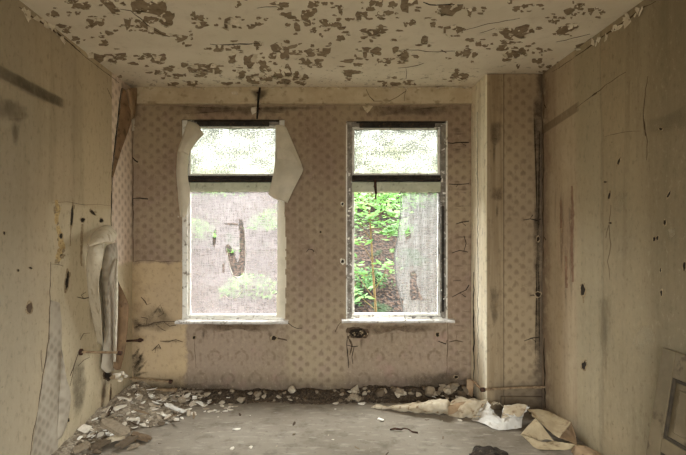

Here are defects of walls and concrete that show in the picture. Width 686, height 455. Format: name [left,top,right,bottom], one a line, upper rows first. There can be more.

peeling [21,0,606,91]
peeling [573,6,643,51]